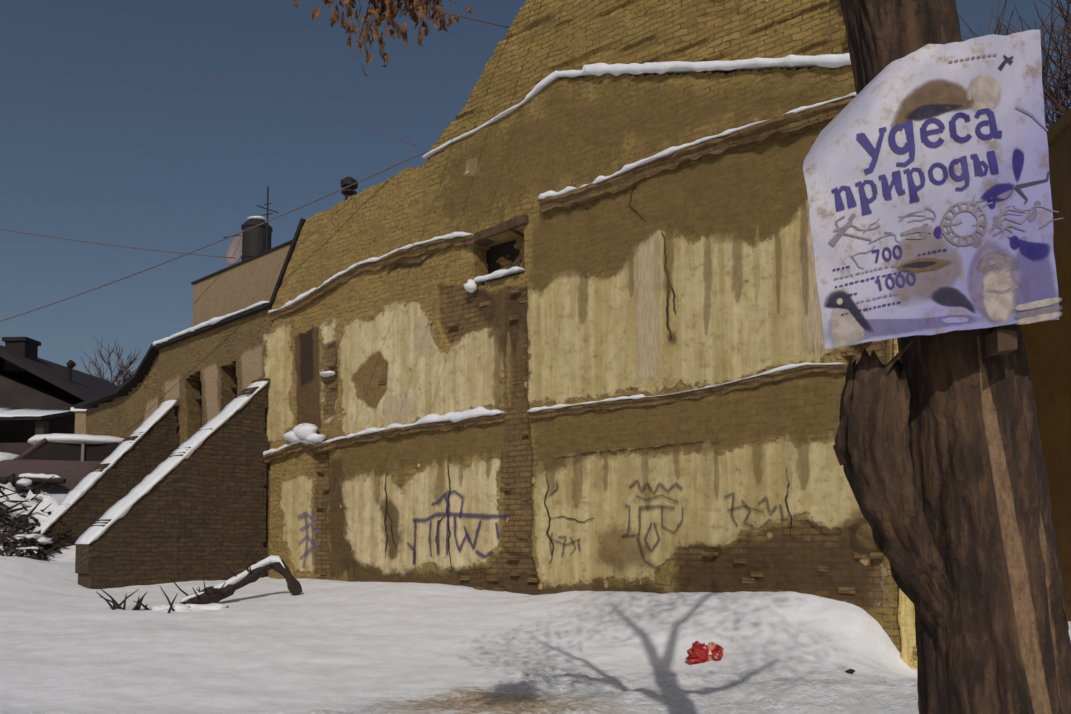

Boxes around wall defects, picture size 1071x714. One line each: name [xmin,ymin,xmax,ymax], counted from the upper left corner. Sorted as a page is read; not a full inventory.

crack [618,165,676,341]
flaking render [280,200,890,611]
crack [384,473,398,557]
crack [544,441,720,563]